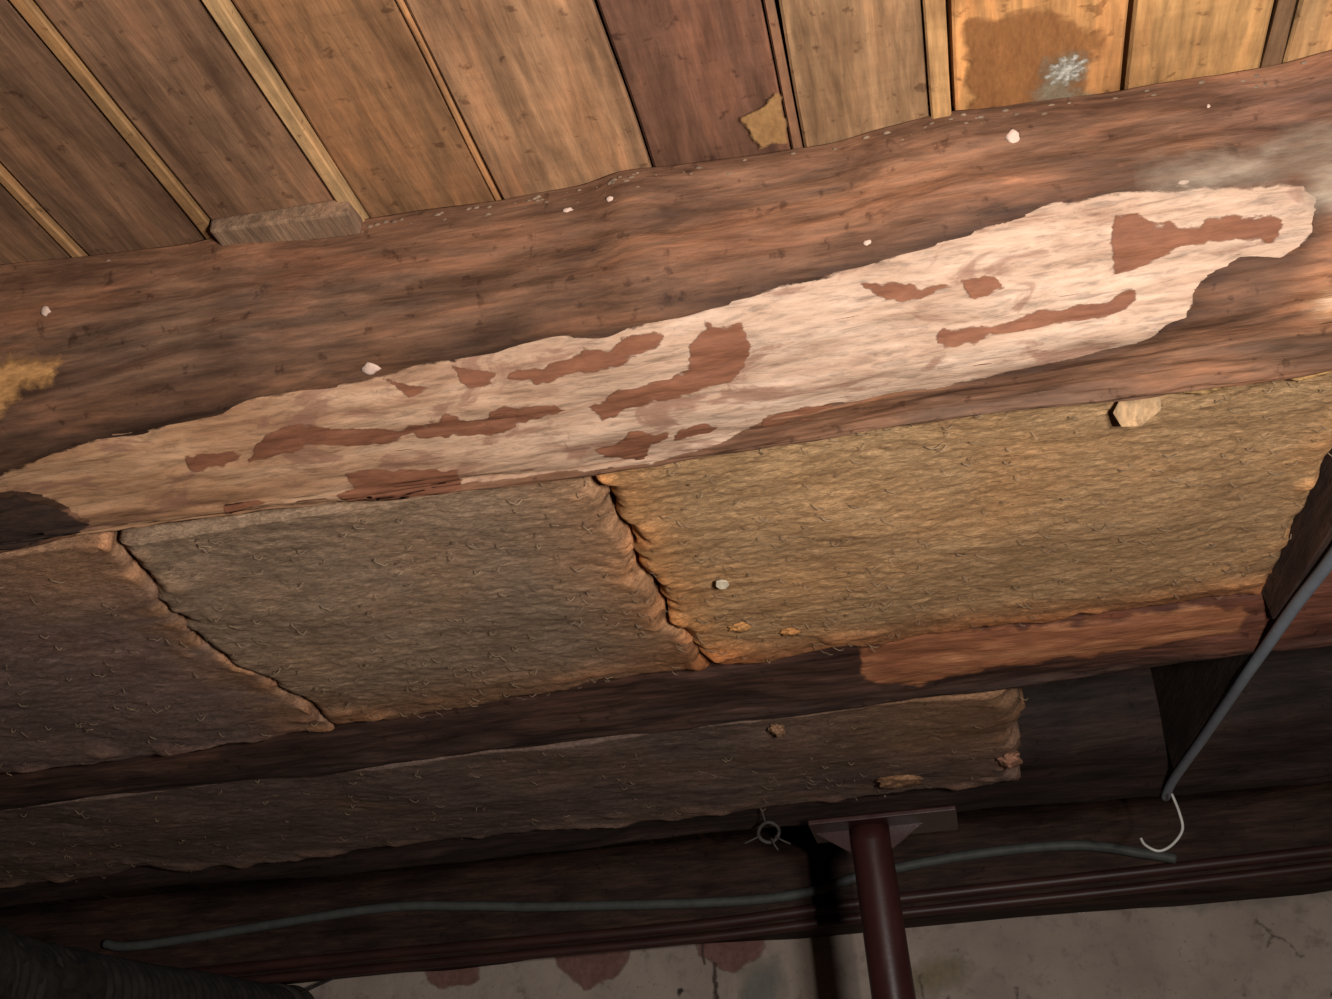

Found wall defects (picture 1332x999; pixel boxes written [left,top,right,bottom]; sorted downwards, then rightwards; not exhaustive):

water stain [967,11,1105,109]
peeling [0,167,1332,535]